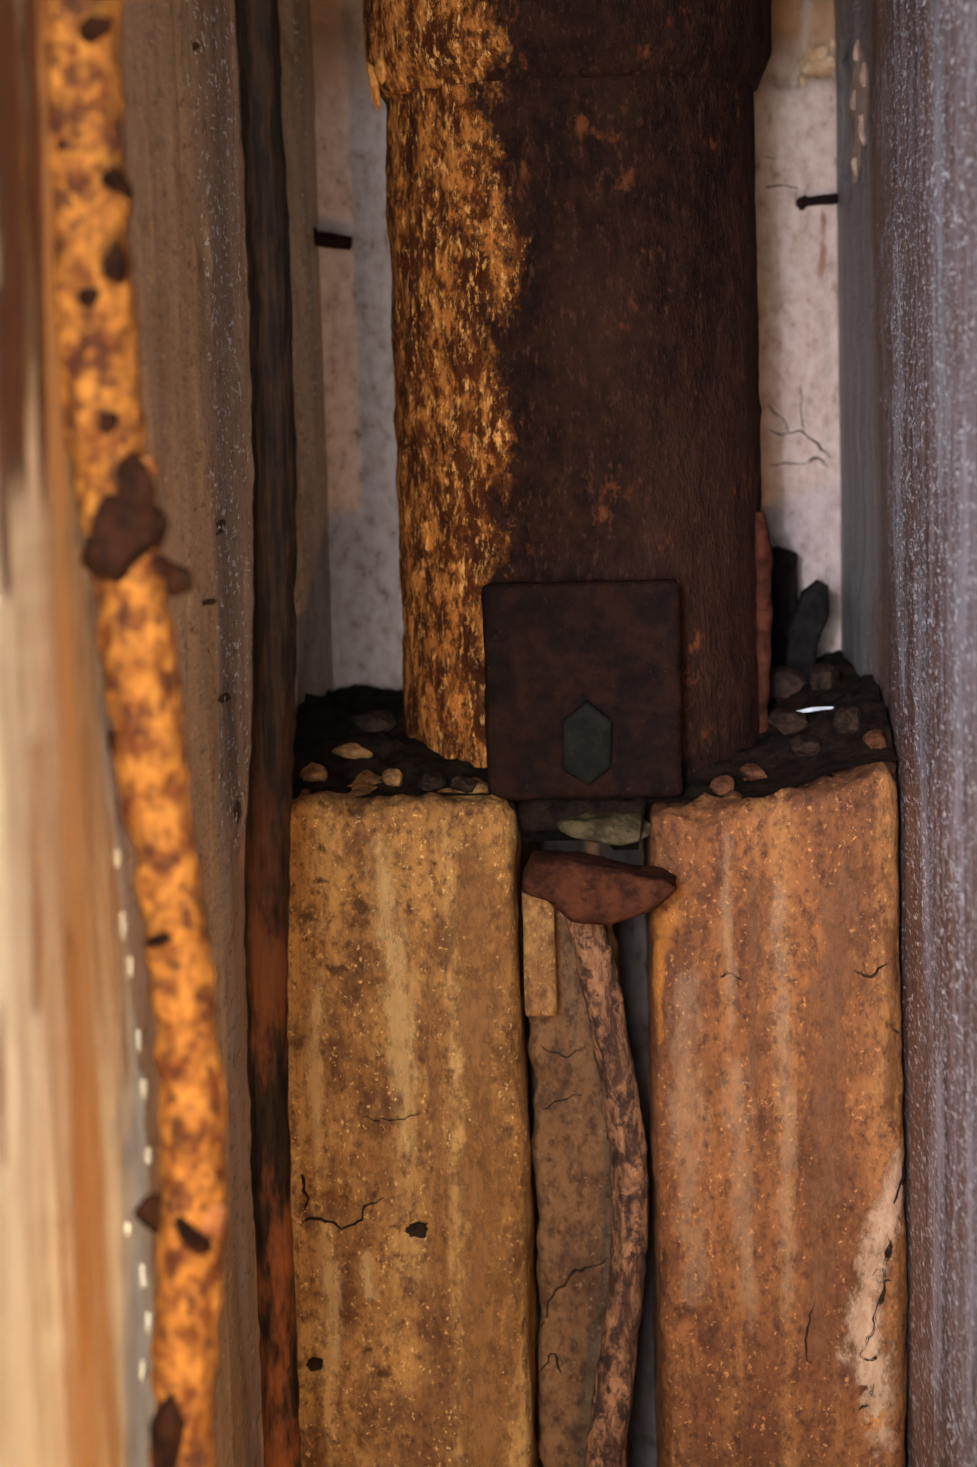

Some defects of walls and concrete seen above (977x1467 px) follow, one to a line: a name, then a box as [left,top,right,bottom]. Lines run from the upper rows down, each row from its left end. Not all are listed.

corrosion [366,57,386,112]
crack [768,388,833,469]
water stain [879,0,977,1467]
crack [362,1113,421,1122]
crack [300,1174,383,1230]